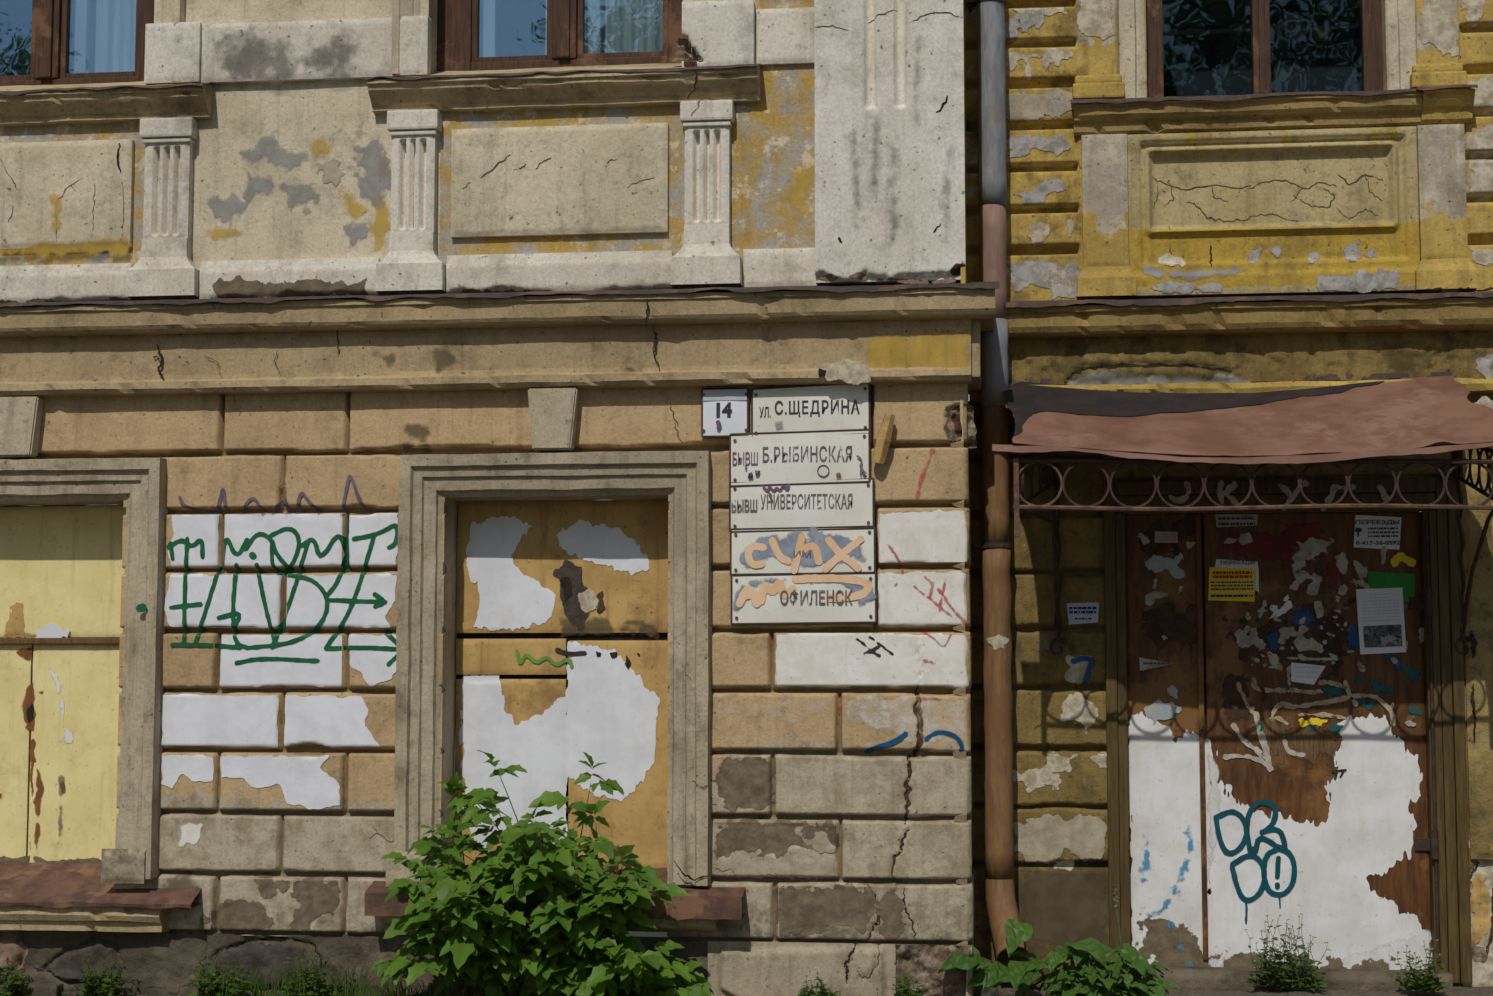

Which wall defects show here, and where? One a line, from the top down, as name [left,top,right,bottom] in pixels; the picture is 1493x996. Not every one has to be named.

peeling [209,136,391,250]
peeling [1006,178,1081,299]
peeling [1005,0,1116,158]
crack [1152,174,1383,267]
peeling [1308,241,1400,293]
peeling [1465,75,1493,199]
peeling [553,559,605,630]
rust [22,683,65,850]
crack [844,671,924,984]
peeling [1012,752,1107,793]
peeling [1013,814,1107,871]
flaking render [1463,835,1493,987]